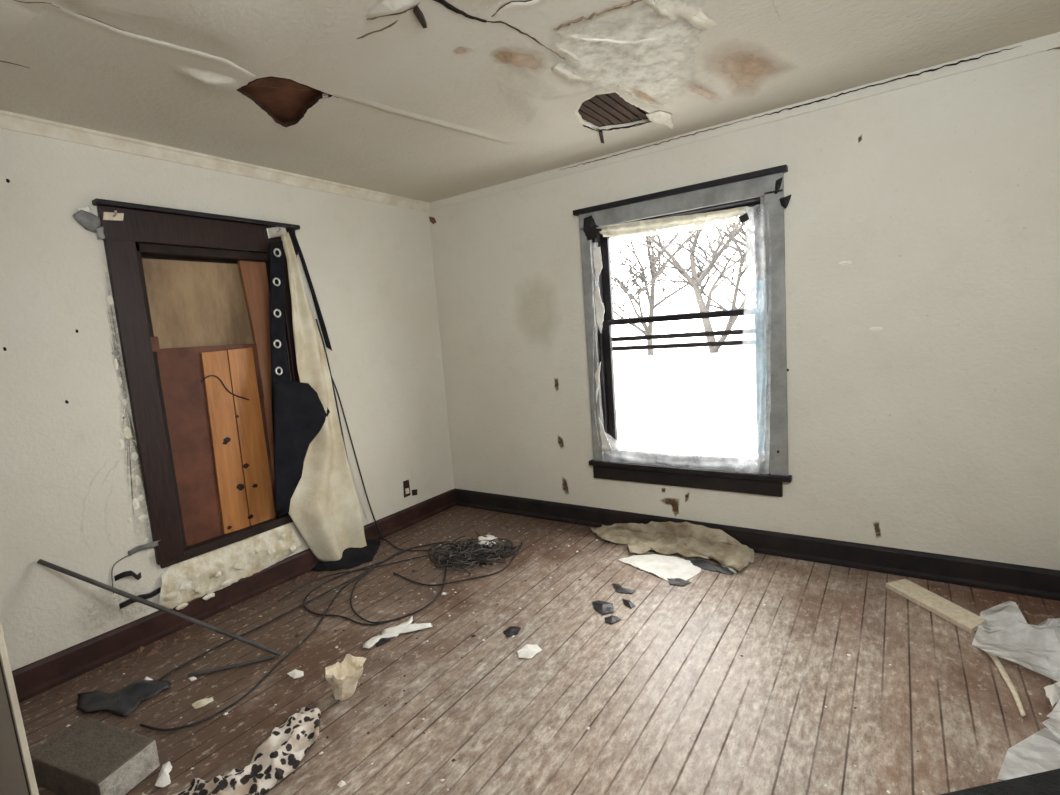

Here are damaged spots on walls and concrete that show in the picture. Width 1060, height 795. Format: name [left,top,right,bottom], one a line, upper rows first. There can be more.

spalling [237,76,333,127]
peeling [357,0,427,39]
crack [433,0,577,69]
spalling [549,0,717,131]
peeling [112,325,148,523]
spalling [159,523,302,610]